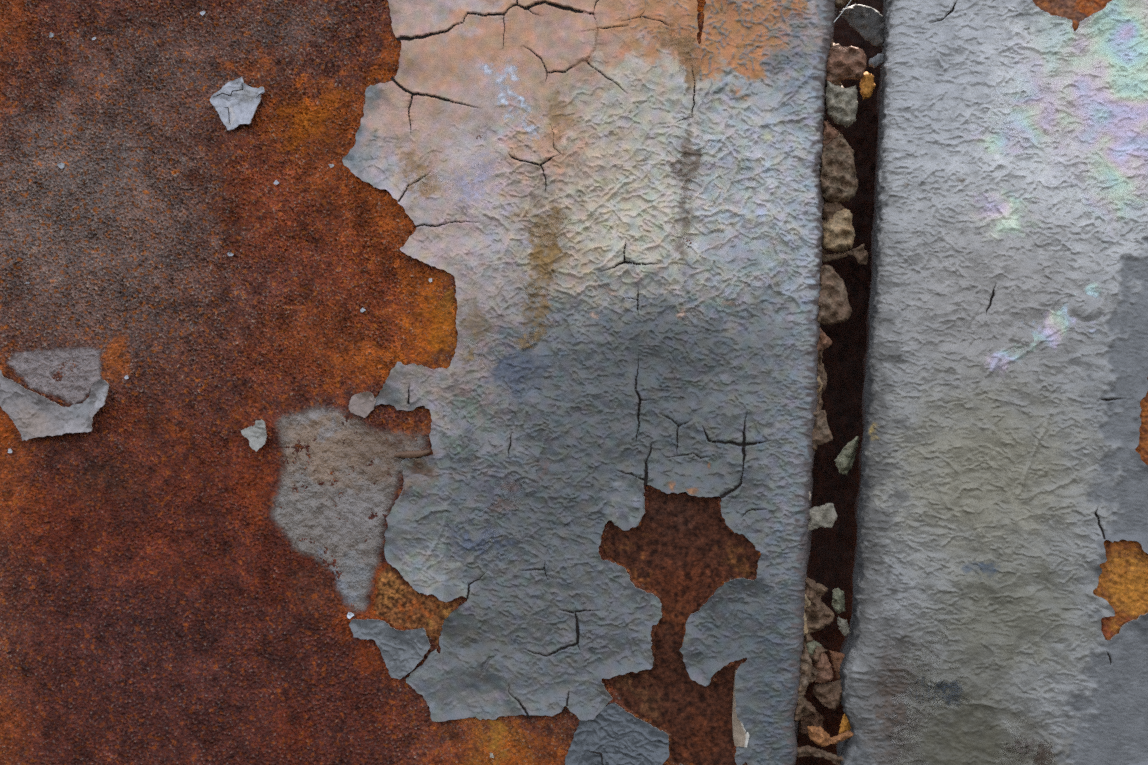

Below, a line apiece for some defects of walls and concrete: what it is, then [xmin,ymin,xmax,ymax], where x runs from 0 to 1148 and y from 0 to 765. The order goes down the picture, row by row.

crack [396,0,669,92]
peeling [210,77,265,131]
crack [390,77,477,128]
crack [509,127,560,192]
crack [604,241,659,271]
corrosion [812,0,885,475]
peeling [0,347,109,453]
peeling [241,0,838,765]
crack [617,357,767,516]
peeling [836,0,1148,765]
corrosion [808,491,837,531]
corrosion [794,577,854,765]